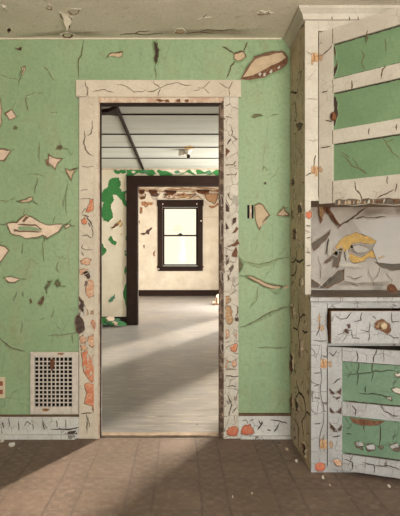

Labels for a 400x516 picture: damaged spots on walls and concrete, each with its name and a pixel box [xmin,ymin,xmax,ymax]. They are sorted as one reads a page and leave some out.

peeling [44,3,82,38]
crack [76,40,234,98]
peeling [222,41,290,82]
peeling [0,147,15,162]
peeling [45,142,79,183]
peeling [0,196,75,242]
peeling [102,170,219,256]
peeling [139,188,290,294]
peeling [74,257,97,413]
peeling [226,419,255,437]